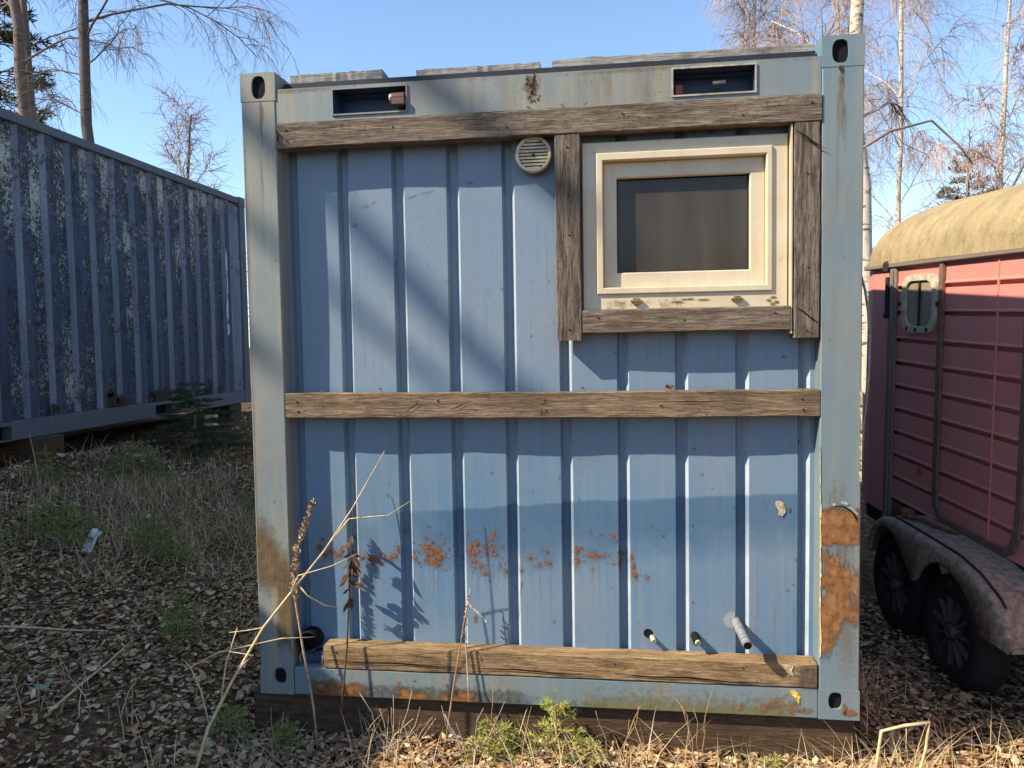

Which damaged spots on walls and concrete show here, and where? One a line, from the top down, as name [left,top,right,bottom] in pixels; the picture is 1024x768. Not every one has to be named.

corrosion [525,74,540,108]
corrosion [257,528,291,641]
corrosion [312,523,552,586]
corrosion [569,520,653,584]
peeling [819,446,859,658]
corrosion [820,507,859,654]